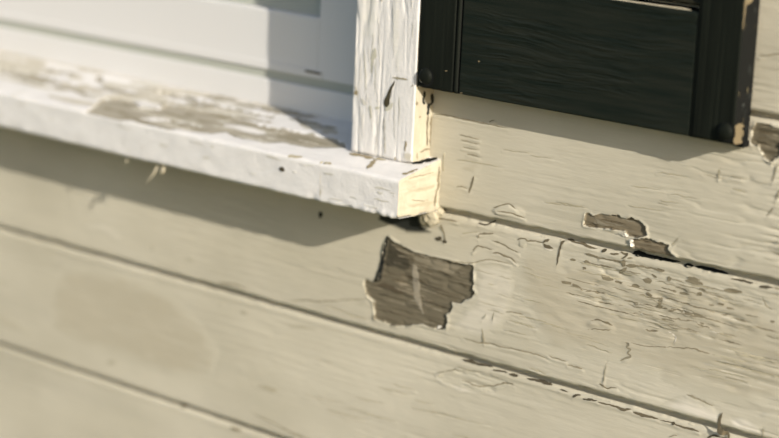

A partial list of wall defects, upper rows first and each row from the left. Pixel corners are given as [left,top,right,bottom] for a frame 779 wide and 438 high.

peeling [0,67,345,148]
peeling [751,123,779,162]
crack [347,0,779,438]
peeling [584,213,673,257]
peeling [365,237,474,330]